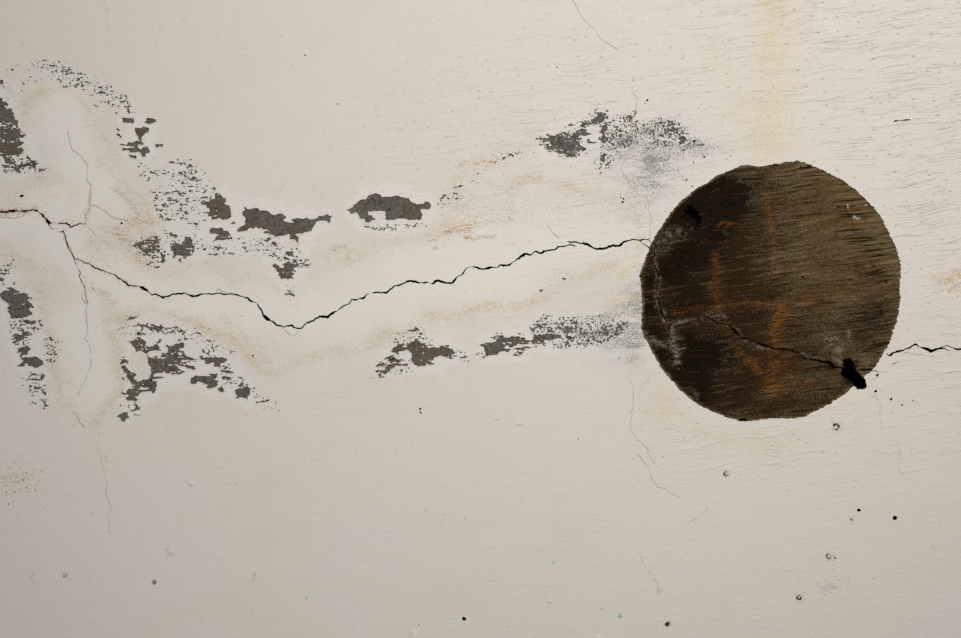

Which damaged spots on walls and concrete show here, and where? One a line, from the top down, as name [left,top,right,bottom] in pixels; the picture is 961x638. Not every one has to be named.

peeling [0,259,61,409]
peeling [0,60,333,297]
peeling [116,313,280,424]
leakage [0,0,899,468]
crack [0,75,961,534]
peeling [345,108,705,231]
peeling [368,155,901,421]